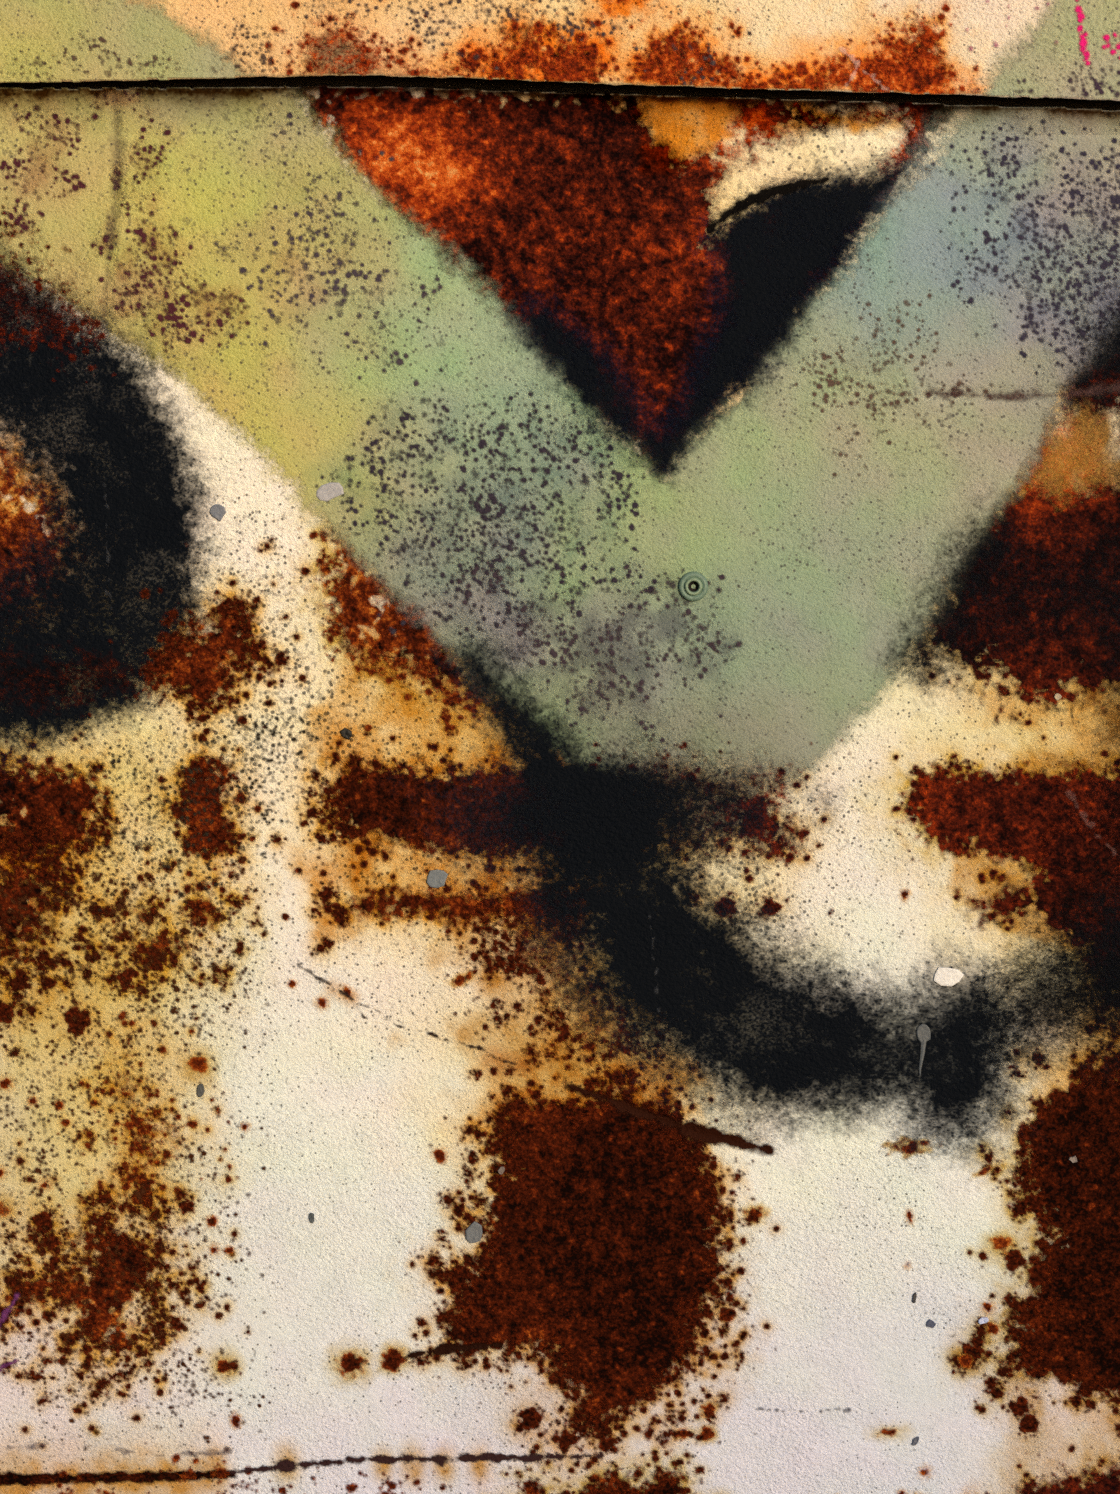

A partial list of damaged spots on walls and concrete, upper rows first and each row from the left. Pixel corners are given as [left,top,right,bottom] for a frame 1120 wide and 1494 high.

corrosion [232,0,980,94]
corrosion [1068,66,1120,97]
corrosion [274,89,955,480]
corrosion [795,294,992,476]
corrosion [916,120,1120,740]
corrosion [0,389,770,1494]
corrosion [639,720,827,882]
corrosion [756,896,788,919]
corrosion [892,750,1120,973]
corrosion [894,1139,928,1154]
corrosion [947,997,1120,1438]
corrosion [1017,1459,1120,1494]